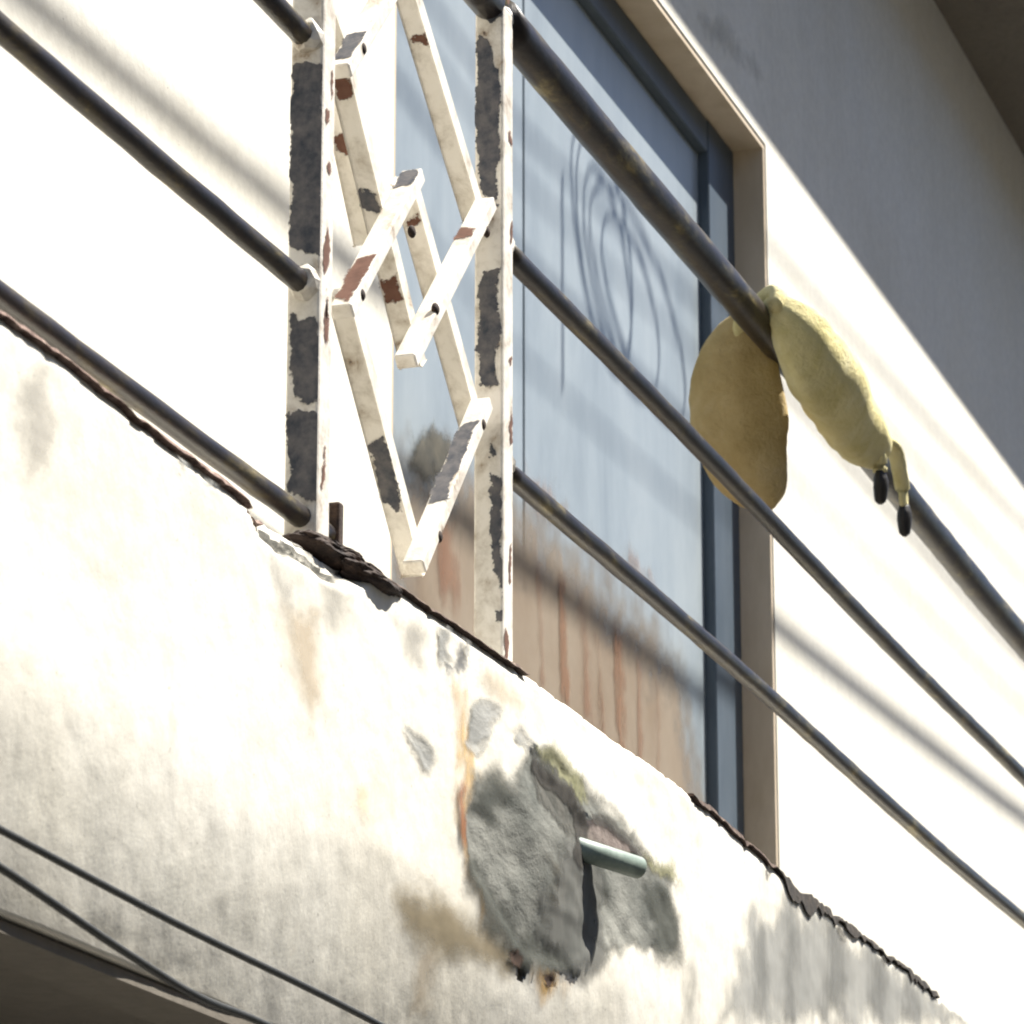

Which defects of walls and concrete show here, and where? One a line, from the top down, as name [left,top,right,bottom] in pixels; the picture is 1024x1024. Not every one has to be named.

flaking render [439,629,451,662]
flaking render [406,729,434,771]
corrosion [460,724,474,854]
flaking render [466,699,503,753]
spalling [465,731,683,976]
water stain [726,902,962,1024]